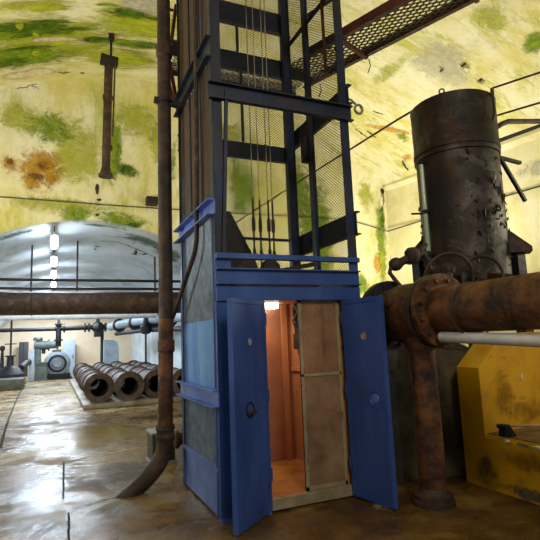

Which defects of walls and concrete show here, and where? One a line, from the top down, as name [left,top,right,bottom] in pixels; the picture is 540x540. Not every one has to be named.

leakage [31,20,90,31]
rust [4,151,63,189]